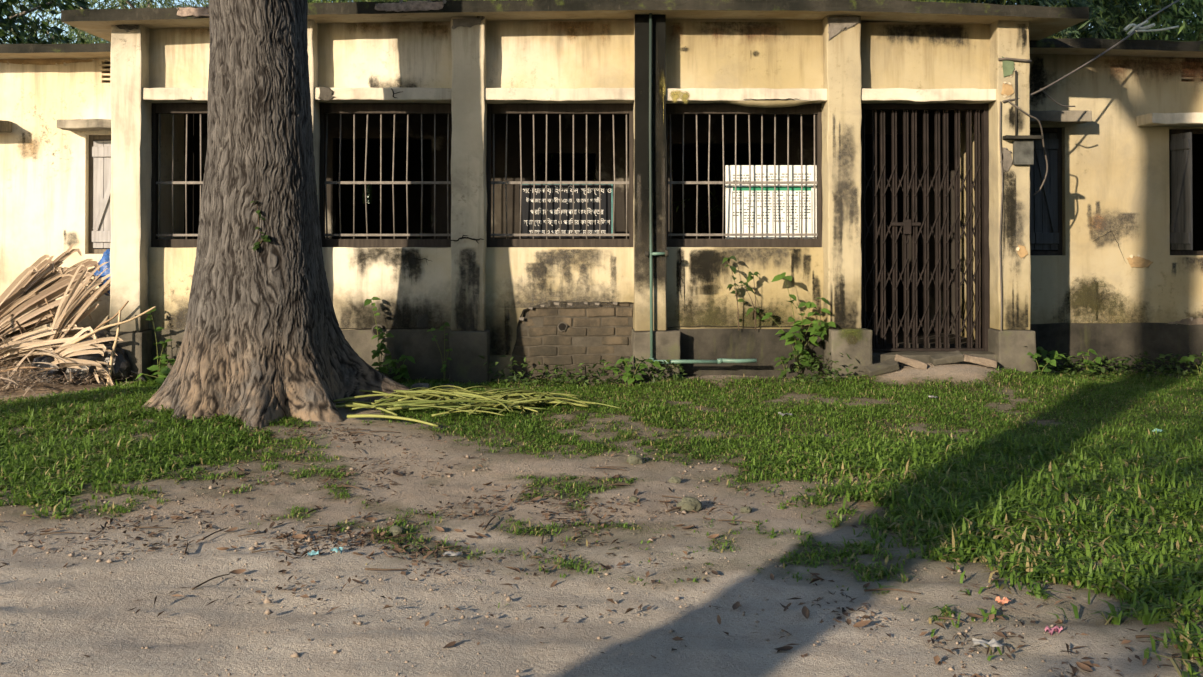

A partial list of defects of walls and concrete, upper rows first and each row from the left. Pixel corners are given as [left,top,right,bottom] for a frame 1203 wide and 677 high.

leakage [634,14,858,343]
leakage [341,248,479,331]
leakage [492,249,616,355]
leakage [1067,280,1123,313]